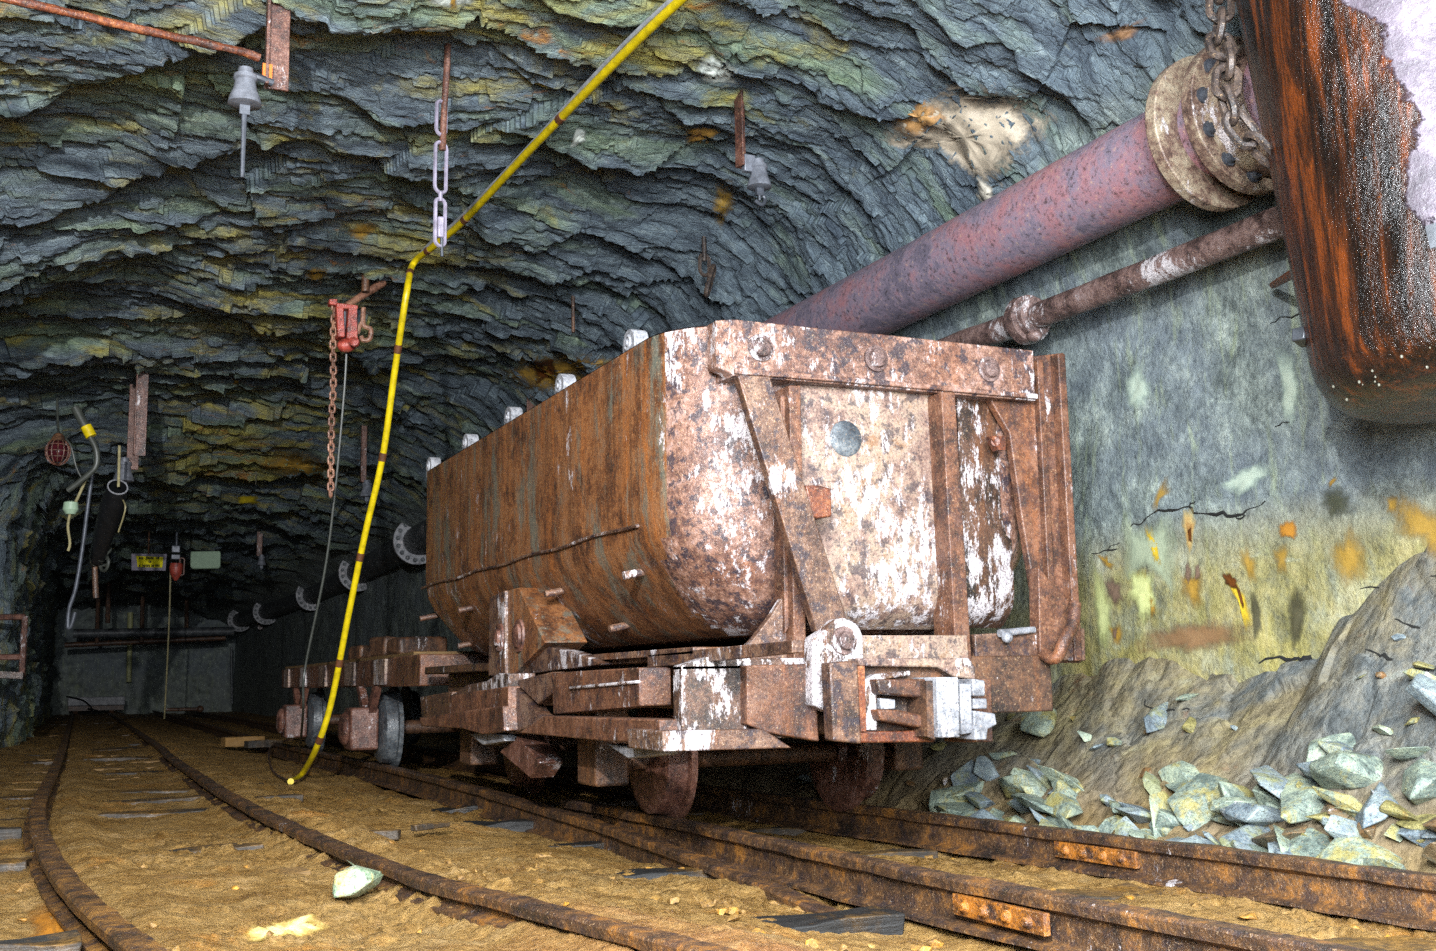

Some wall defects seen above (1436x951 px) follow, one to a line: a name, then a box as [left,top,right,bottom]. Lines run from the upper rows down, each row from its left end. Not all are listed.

rust [1147,532,1159,561]
crack [1092,501,1266,554]
rust [1182,513,1200,603]
rust [1277,521,1296,568]
rust [1337,540,1360,577]
rust [1389,499,1436,550]
rust [1099,556,1155,615]
rust [1223,555,1254,624]
rust [1110,627,1121,643]
rust [1152,626,1229,648]